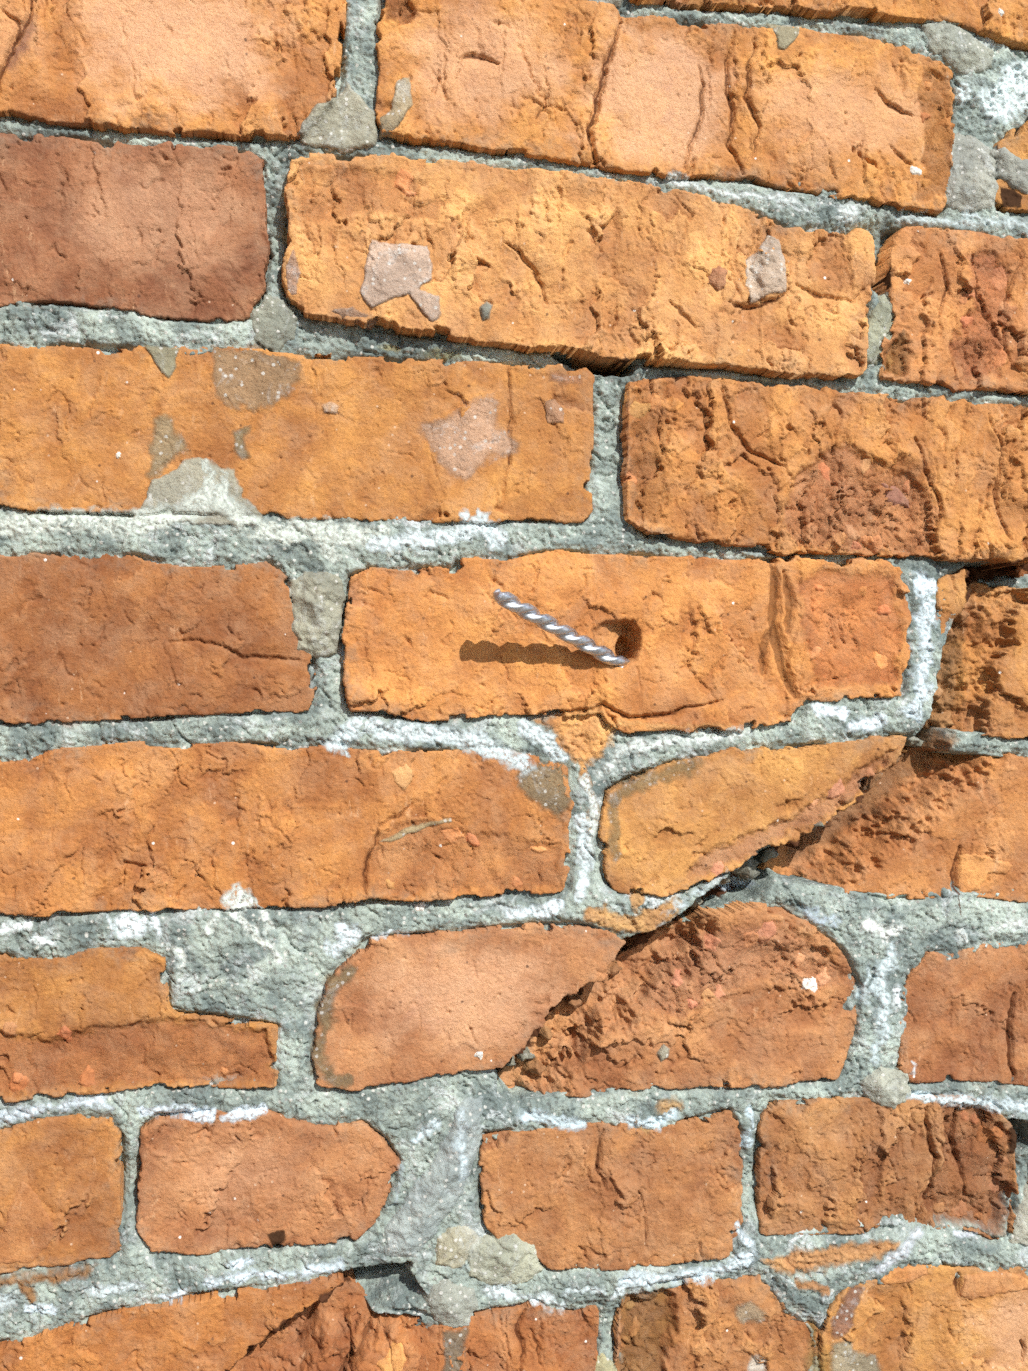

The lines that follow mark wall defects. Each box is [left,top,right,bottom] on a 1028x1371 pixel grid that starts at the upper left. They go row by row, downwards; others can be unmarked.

crack [725,405,773,463]
crack [501,436,1028,1081]
crack [363,814,401,877]
crack [596,1138,604,1183]
crack [920,1122,964,1209]
crack [246,1271,350,1355]
crack [515,1317,538,1357]